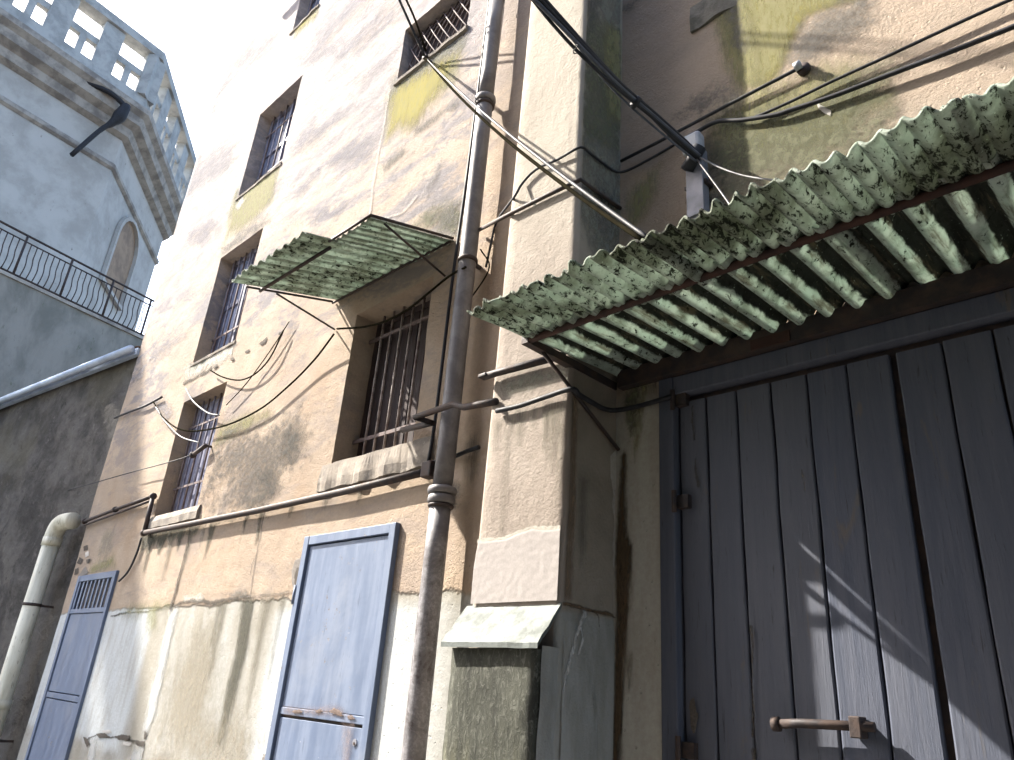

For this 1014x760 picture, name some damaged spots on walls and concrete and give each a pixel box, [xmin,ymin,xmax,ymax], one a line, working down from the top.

damp [709,0,896,206]
damp [140,412,307,570]
damp [161,598,269,760]
crack [563,602,616,686]